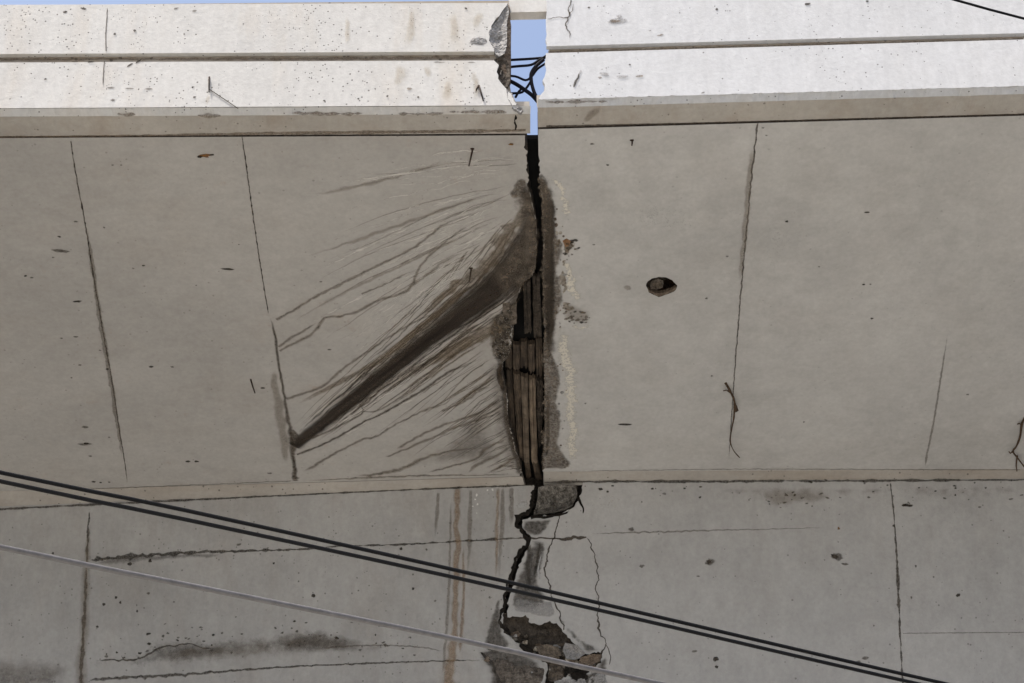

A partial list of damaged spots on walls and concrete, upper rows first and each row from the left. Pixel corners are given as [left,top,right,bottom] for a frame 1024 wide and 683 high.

spalling [470,5,523,115]
water stain [273,149,590,481]
spalling [491,302,517,391]
peeling [549,208,575,329]
water stain [101,623,212,662]
water stain [486,601,507,652]
spalling [481,613,607,683]
crack [498,485,611,665]